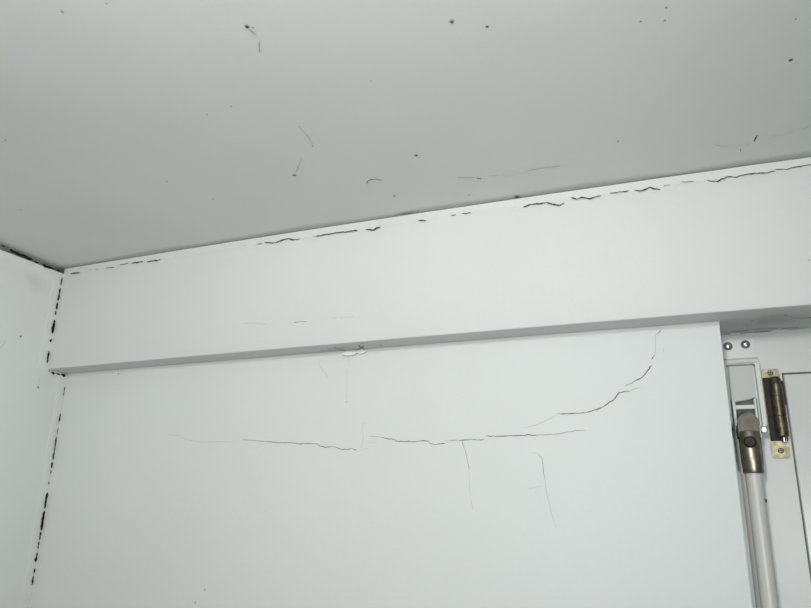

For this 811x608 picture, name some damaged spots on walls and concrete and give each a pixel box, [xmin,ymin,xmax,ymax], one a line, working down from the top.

crack [259,227,380,244]
crack [523,164,811,207]
crack [1,245,160,584]
crack [249,330,664,526]